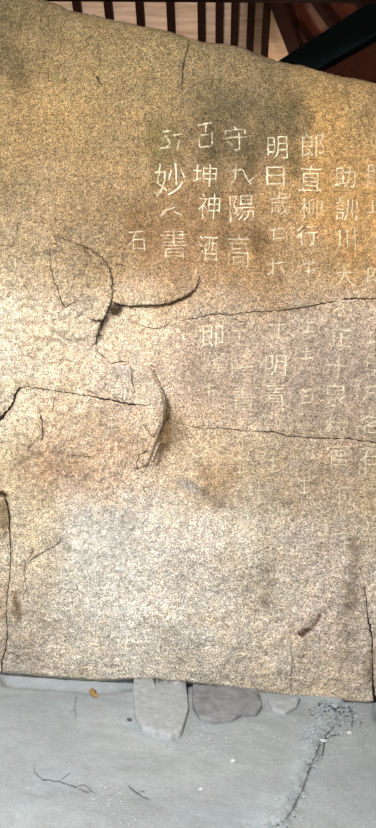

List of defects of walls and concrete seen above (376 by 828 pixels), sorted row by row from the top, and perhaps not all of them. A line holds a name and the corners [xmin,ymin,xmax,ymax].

crack [0,237,376,470]
crack [0,492,61,674]
crack [359,565,376,701]
crack [288,714,353,816]